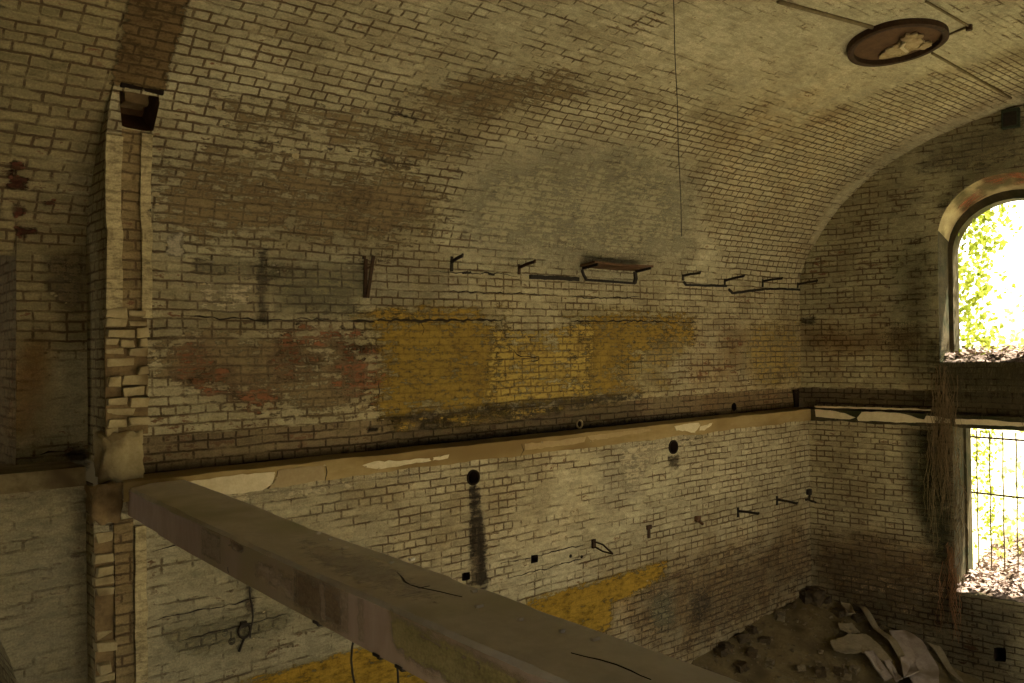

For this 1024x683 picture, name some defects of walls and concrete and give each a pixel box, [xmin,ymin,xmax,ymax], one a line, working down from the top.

crack [180,271,549,363]
peeling [815,406,1024,427]
peeling [189,464,326,494]
peeling [362,455,449,475]
leakage [470,486,487,589]